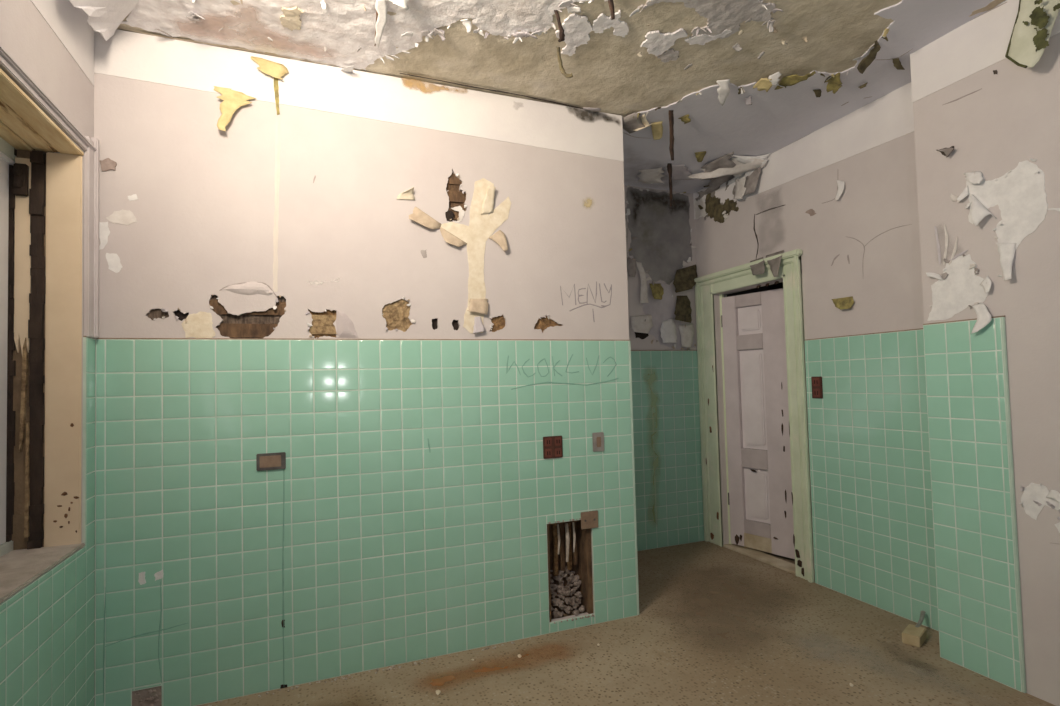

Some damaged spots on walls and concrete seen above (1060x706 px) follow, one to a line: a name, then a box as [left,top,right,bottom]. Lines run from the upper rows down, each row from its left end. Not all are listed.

spalling [69,0,902,351]
leakage [625,192,687,252]
peeling [926,158,1060,334]
peeling [1019,483,1060,533]